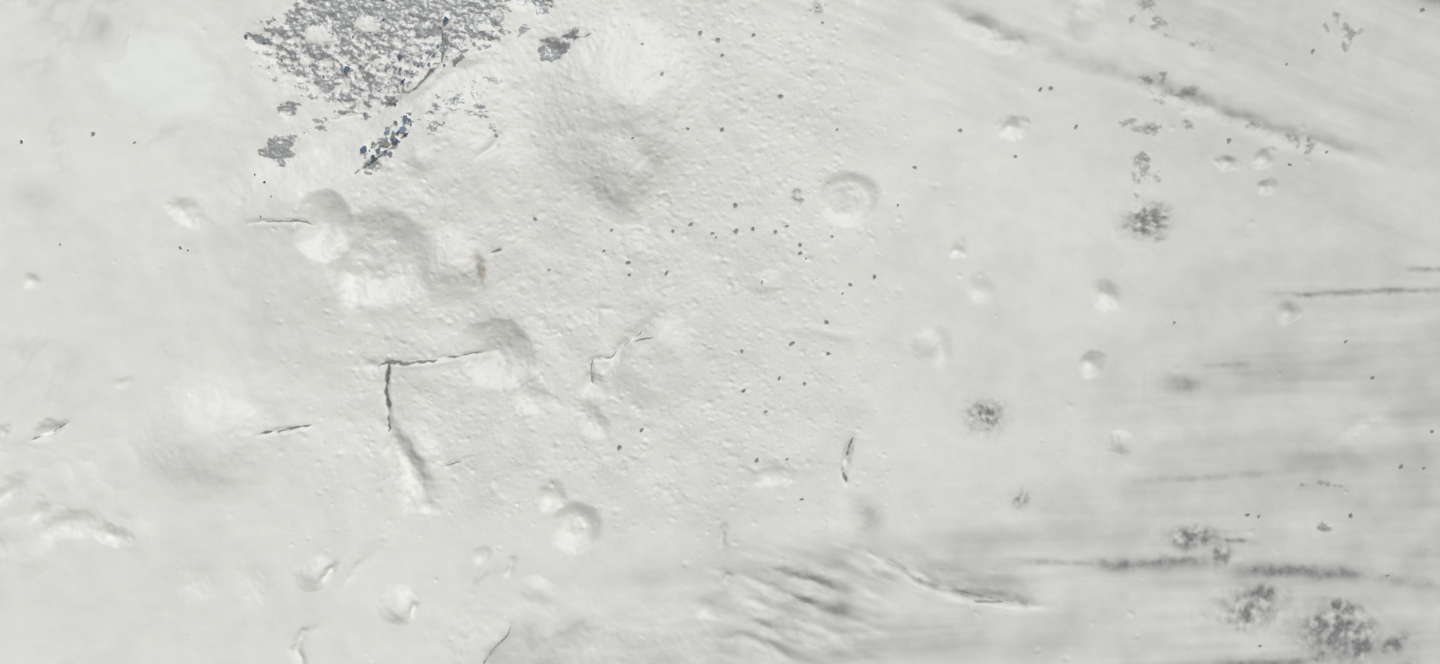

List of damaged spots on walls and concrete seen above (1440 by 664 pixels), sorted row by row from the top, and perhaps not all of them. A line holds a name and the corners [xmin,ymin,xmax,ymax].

peeling [231,0,596,174]
crack [381,352,479,432]